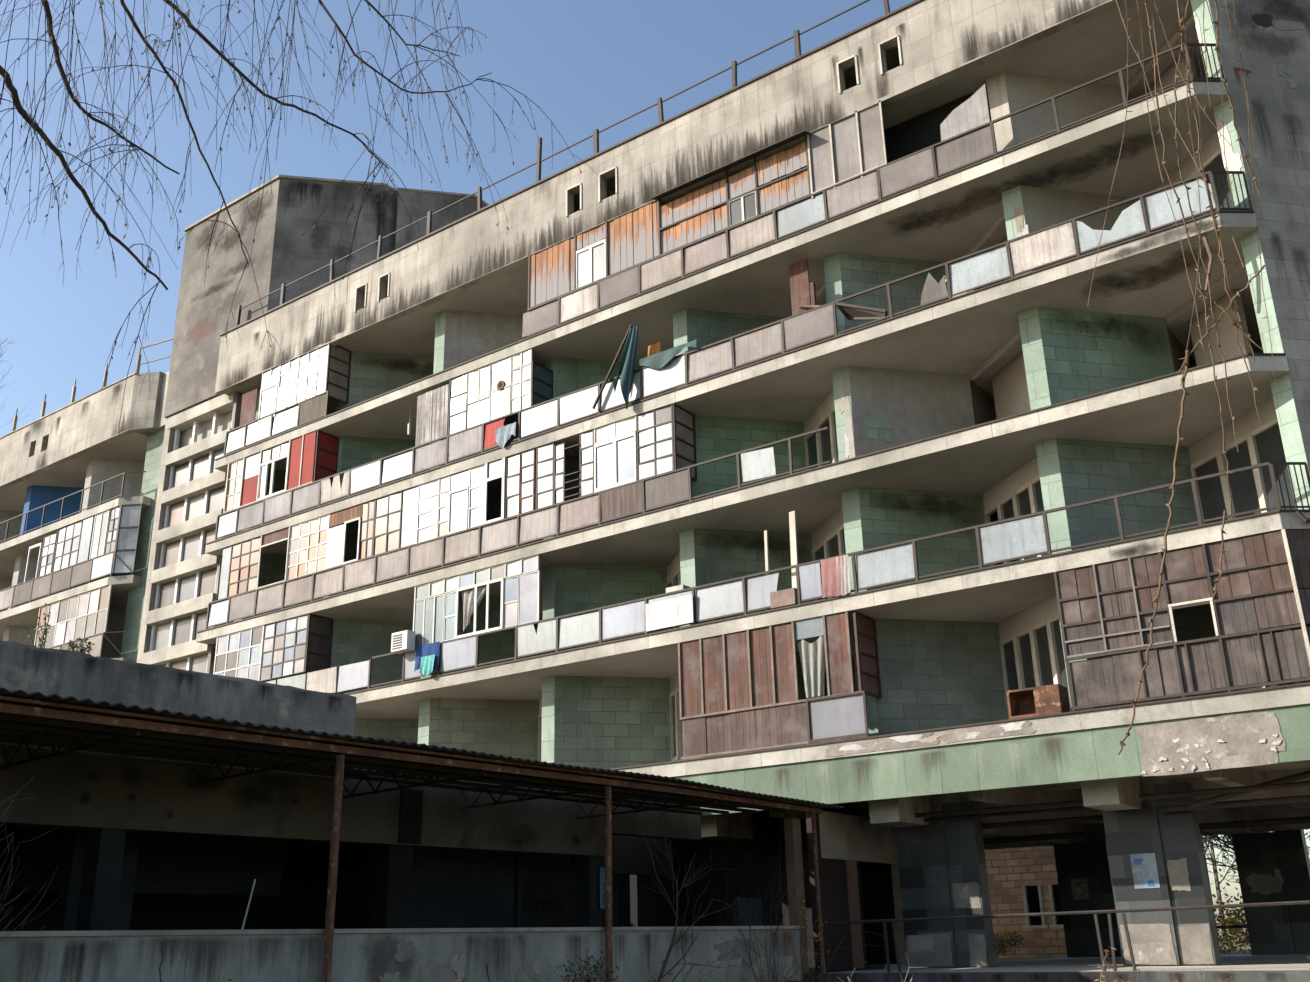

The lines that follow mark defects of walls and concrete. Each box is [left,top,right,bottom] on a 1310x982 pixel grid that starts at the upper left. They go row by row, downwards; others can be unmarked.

damp [877,70,886,98]
damp [1019,134,1152,186]
damp [446,108,838,291]
damp [1101,250,1207,287]
damp [263,288,430,370]
spalling [1135,712,1286,776]
peeling [379,939,466,982]